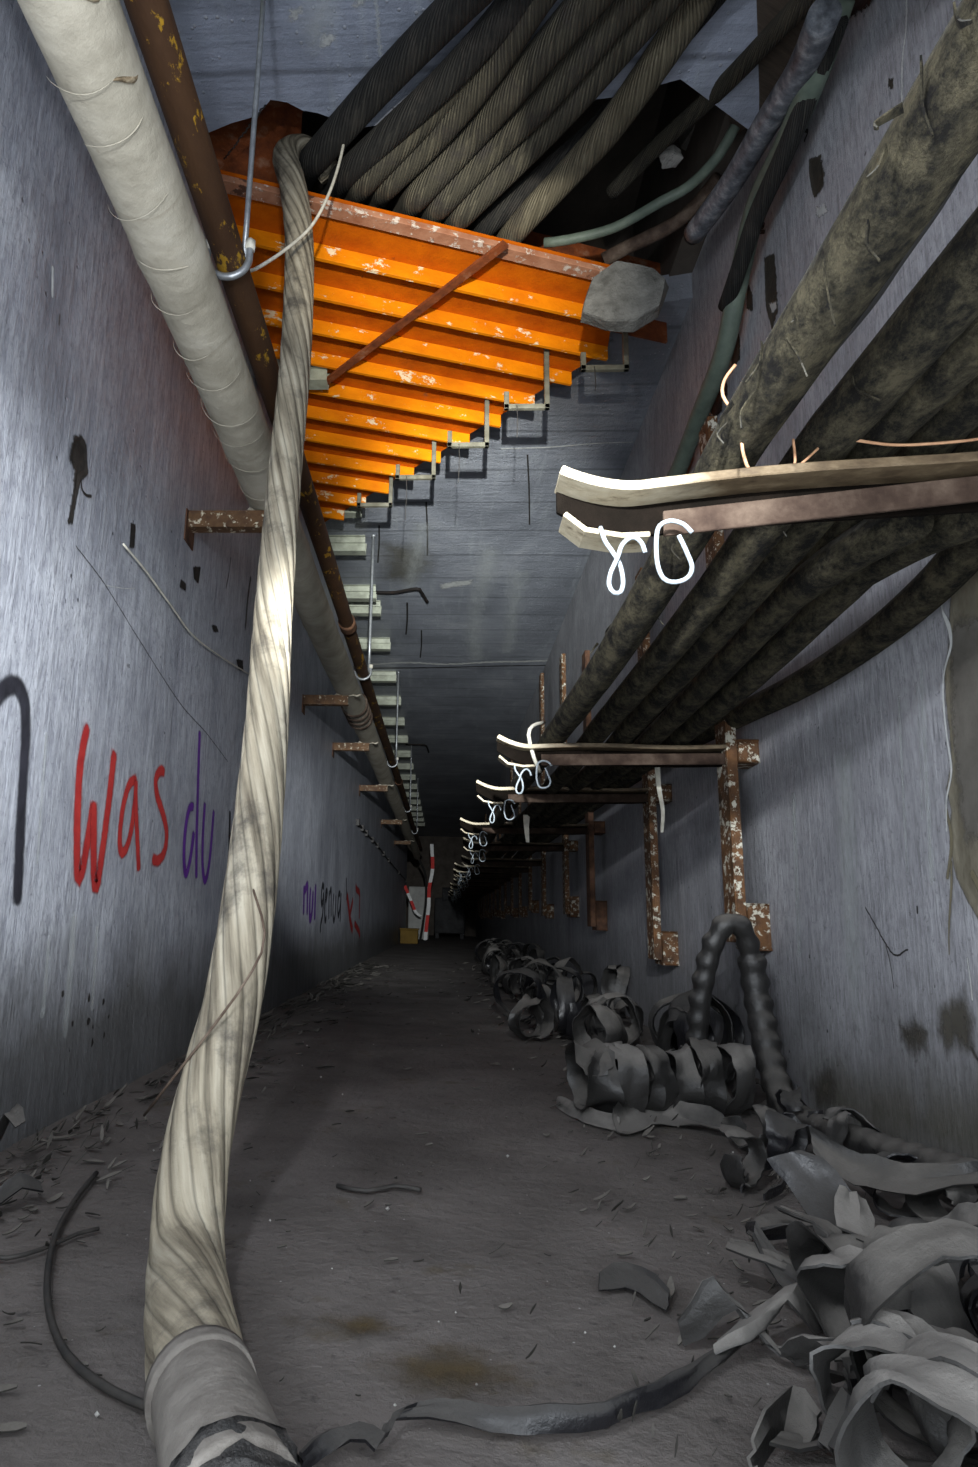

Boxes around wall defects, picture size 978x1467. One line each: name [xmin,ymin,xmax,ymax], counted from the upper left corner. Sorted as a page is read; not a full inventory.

flaking render [944,571,978,1001]